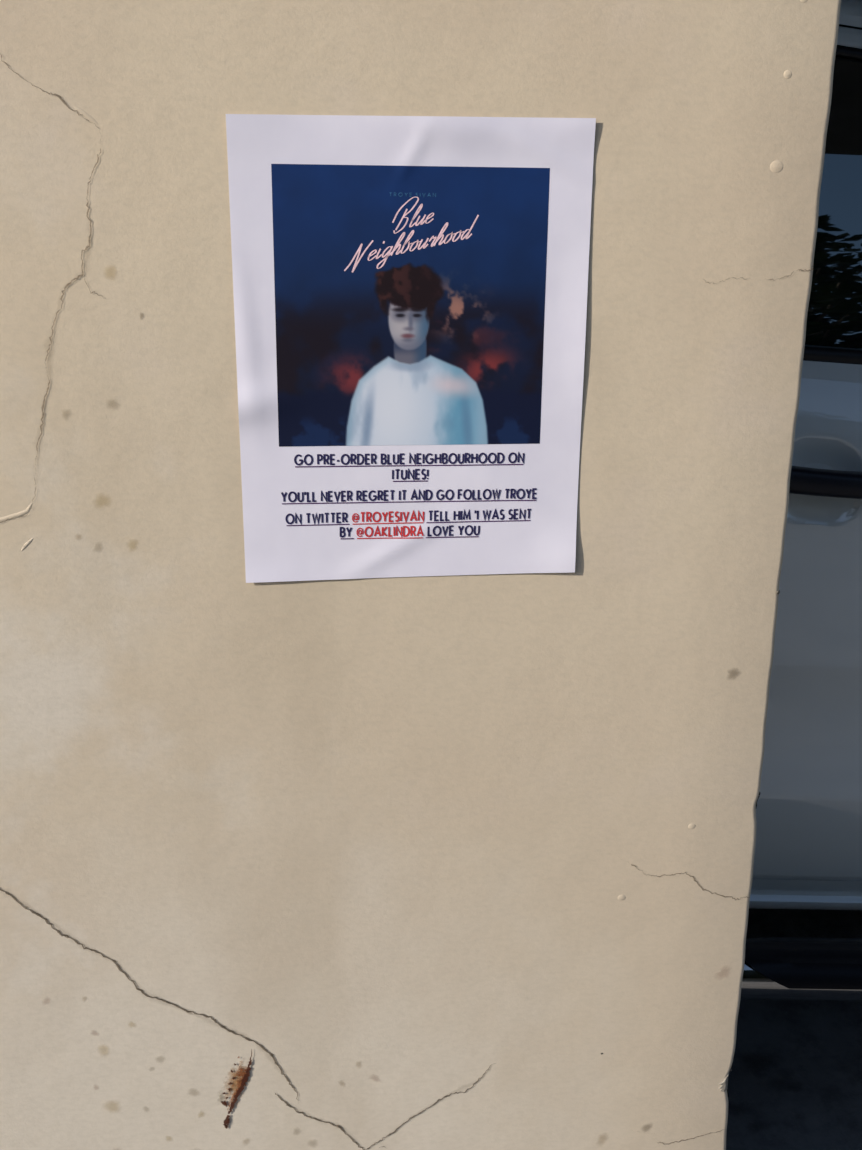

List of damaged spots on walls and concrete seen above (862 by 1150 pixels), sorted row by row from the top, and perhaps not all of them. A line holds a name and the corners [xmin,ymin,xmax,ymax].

crack [1,55,79,115]
crack [37,149,101,445]
crack [631,864,750,900]
crack [0,889,495,1150]
corrosion [221,1049,252,1129]